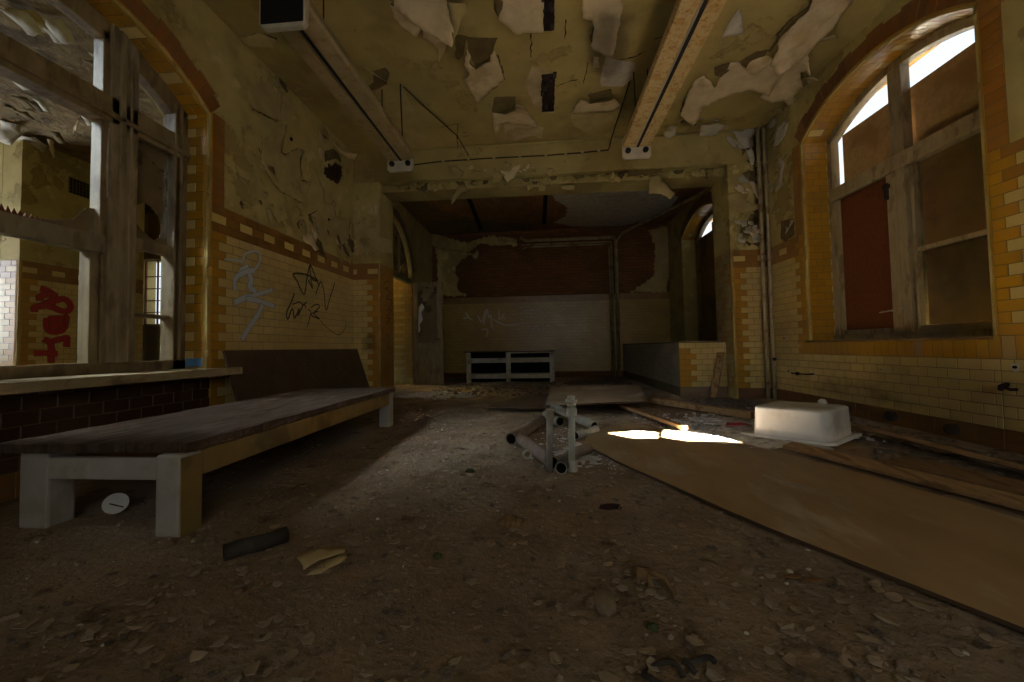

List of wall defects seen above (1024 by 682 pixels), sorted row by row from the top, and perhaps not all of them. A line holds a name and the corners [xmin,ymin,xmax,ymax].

peeling [0,6,78,45]
peeling [0,81,92,159]
peeling [363,66,428,150]
peeling [390,0,553,141]
peeling [571,0,636,132]
peeling [662,0,854,194]
spalling [320,142,357,187]
flaking render [405,163,709,297]
peeling [733,214,766,248]